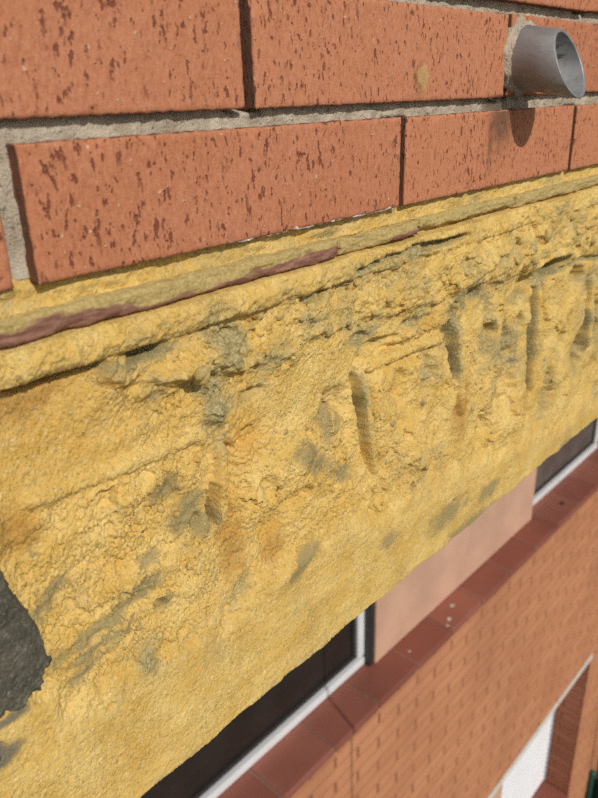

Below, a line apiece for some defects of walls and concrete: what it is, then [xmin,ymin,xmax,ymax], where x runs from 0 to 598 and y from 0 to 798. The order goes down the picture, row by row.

spalling [0,201,598,705]